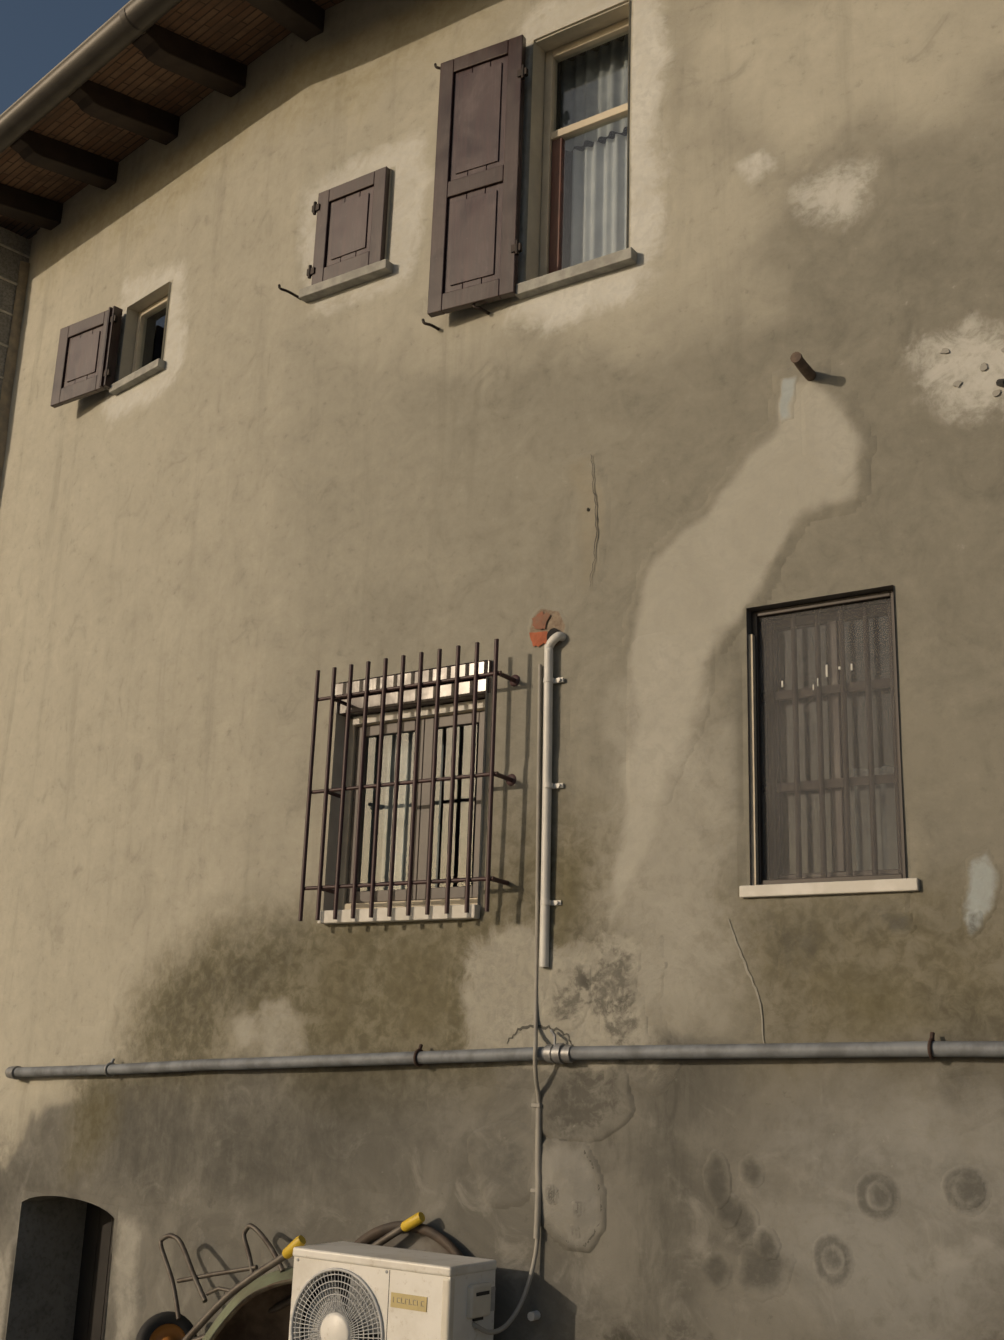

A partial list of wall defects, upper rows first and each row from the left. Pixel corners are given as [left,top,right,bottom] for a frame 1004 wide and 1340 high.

water stain [0,632,1004,1340]
peeling [959,849,1002,940]